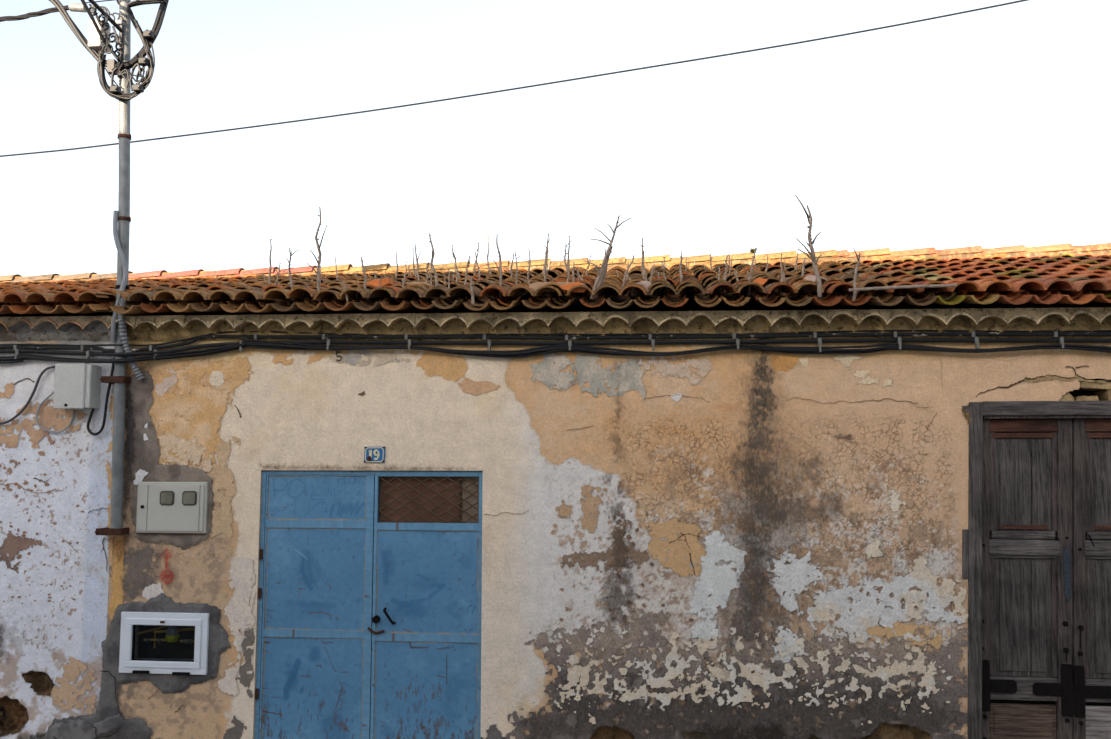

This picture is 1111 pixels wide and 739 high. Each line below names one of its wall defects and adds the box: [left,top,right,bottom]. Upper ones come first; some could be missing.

peeling [0,382,14,399]
peeling [529,353,713,402]
crack [976,365,1089,397]
spalling [1059,375,1111,401]
peeling [0,399,88,498]
peeling [0,506,76,604]
damp [505,338,968,739]
peeling [540,485,968,739]
peeling [22,657,97,715]
spalling [0,696,29,737]